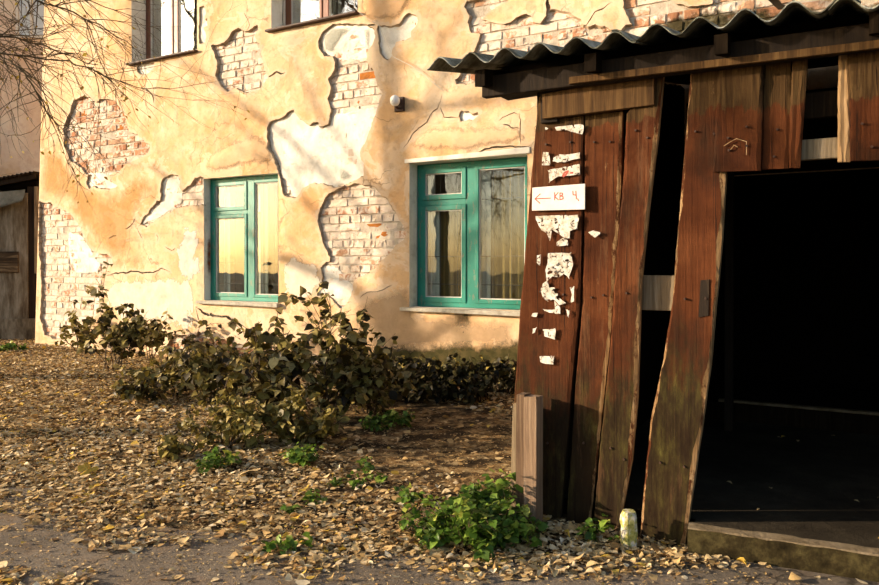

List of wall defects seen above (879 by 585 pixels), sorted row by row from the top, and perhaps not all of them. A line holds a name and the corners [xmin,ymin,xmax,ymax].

flaking render [198,5,268,93]
flaking render [464,0,834,55]
water stain [664,10,736,32]
flaking render [455,73,475,85]
flaking render [63,95,150,190]
flaking render [267,13,418,308]
crack [404,96,458,147]
flaking render [139,174,206,227]
crack [107,218,174,276]
flaking render [38,201,253,356]
crack [195,306,239,330]